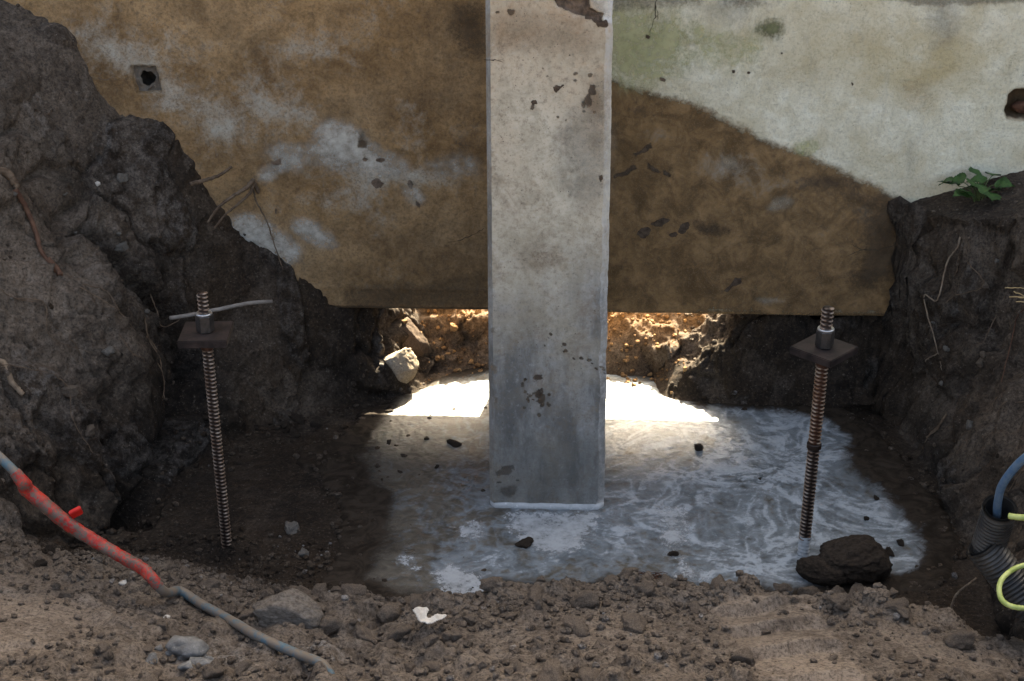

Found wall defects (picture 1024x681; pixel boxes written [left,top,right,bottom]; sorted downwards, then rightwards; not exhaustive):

spalling [555,0,604,20]
leakage [275,124,396,171]
leakage [234,216,329,262]
leakage [637,218,730,238]